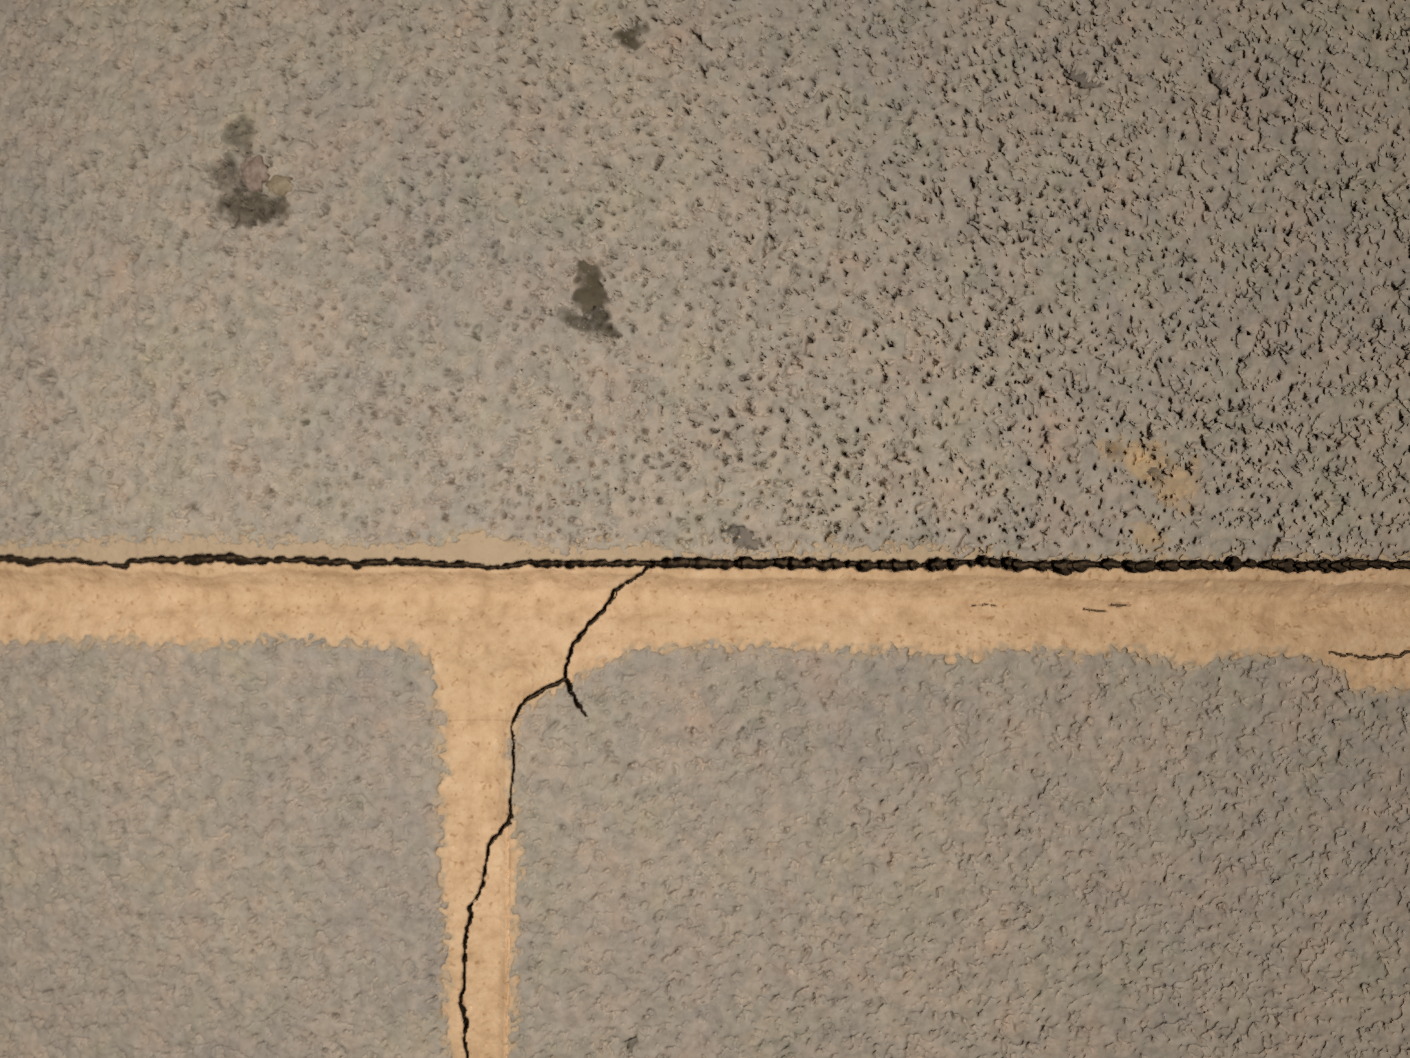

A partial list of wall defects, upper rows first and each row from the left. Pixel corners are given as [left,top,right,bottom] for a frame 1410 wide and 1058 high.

crack [0,552,1410,1058]